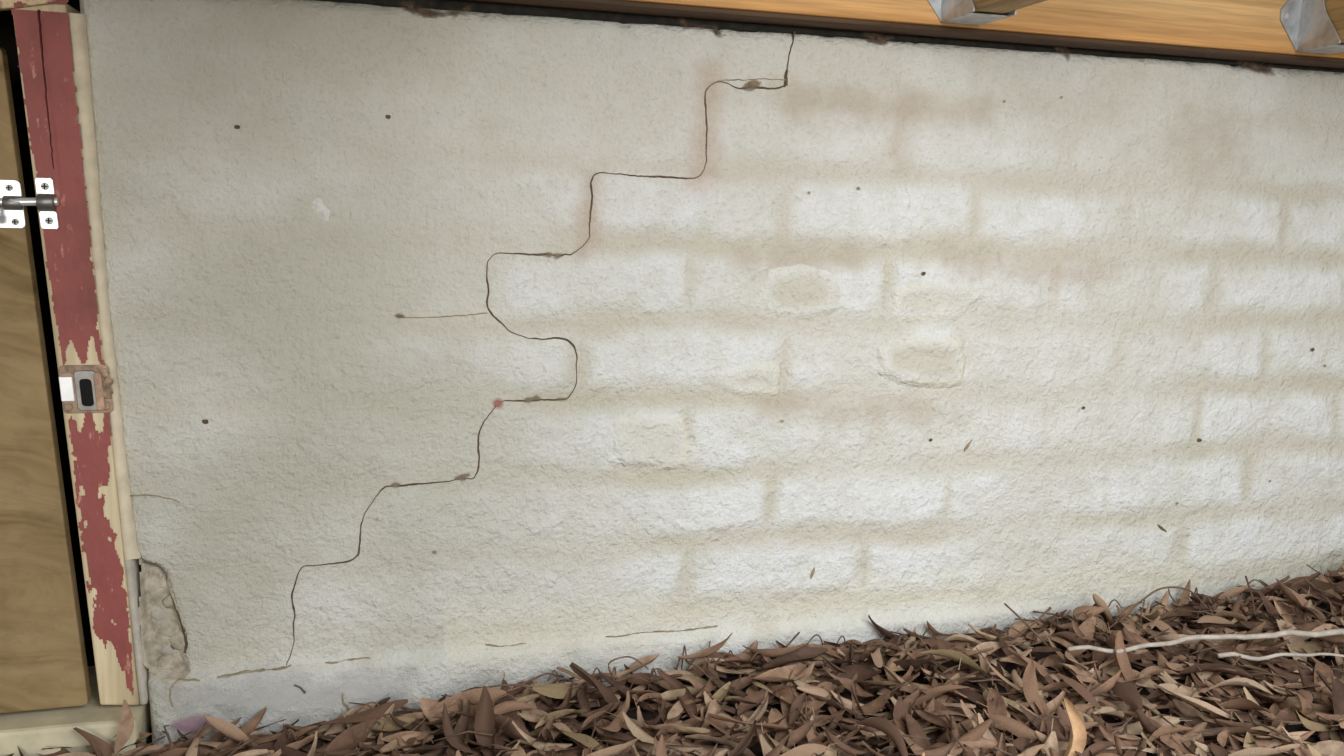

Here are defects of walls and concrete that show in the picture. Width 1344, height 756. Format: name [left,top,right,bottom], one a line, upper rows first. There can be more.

peeling [11,0,105,365]
crack [169,31,795,707]
peeling [68,413,191,695]